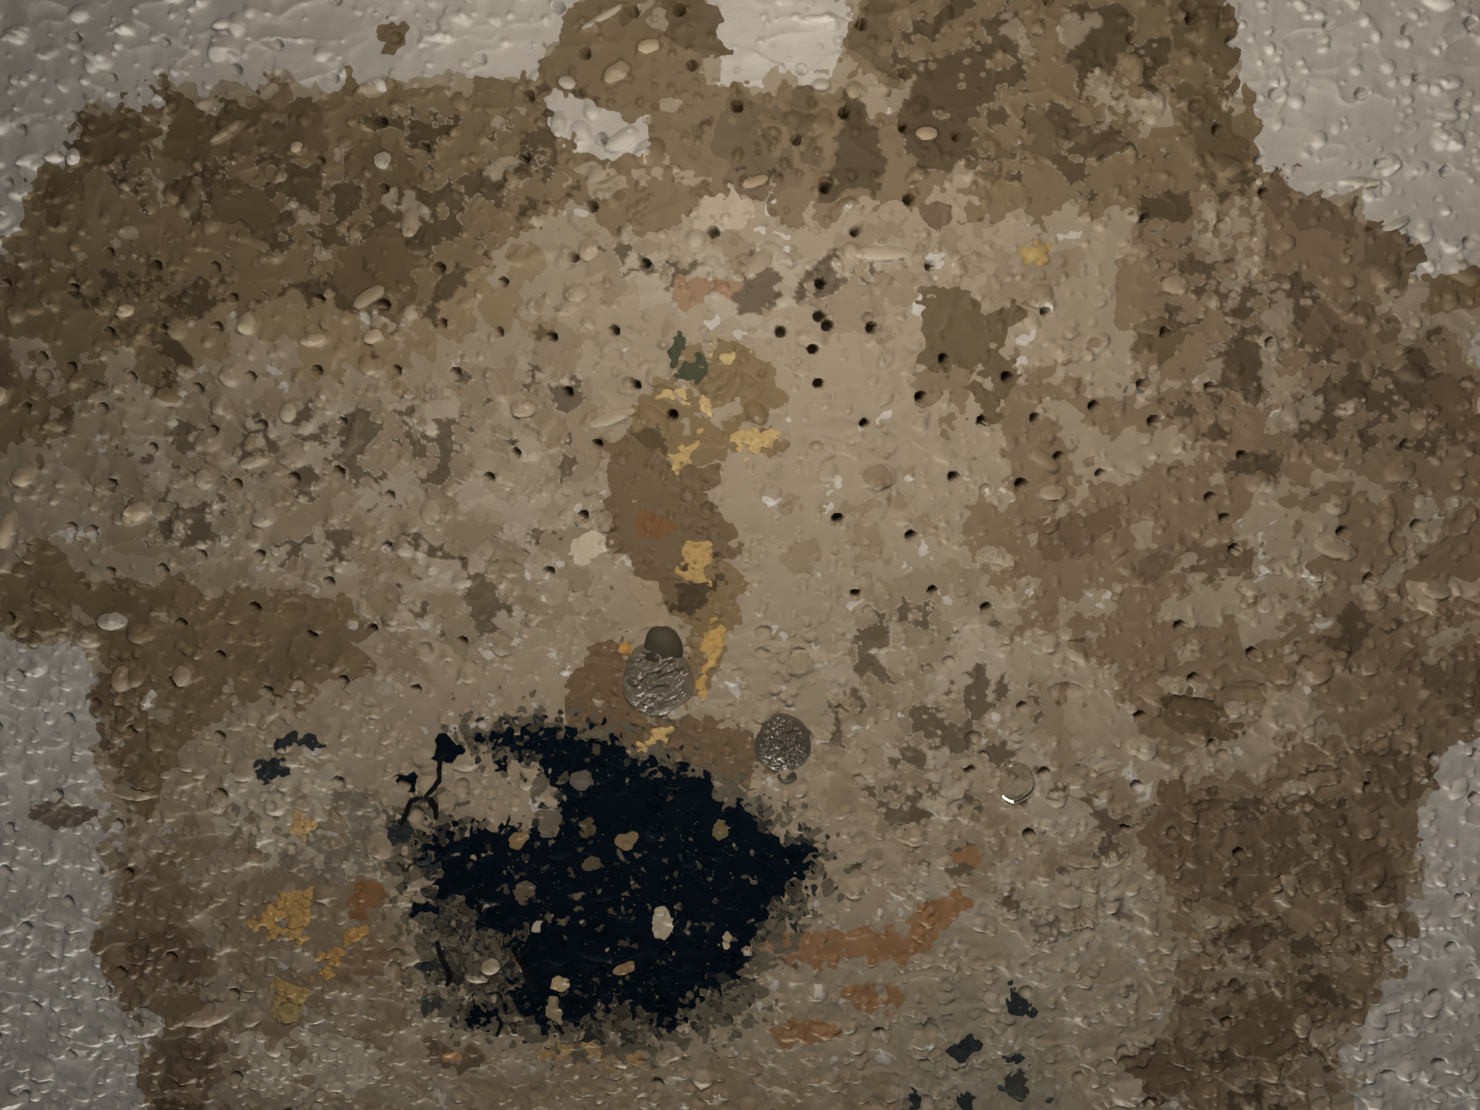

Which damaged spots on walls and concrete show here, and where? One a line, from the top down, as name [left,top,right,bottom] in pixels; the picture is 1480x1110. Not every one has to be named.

damp [376,16,410,55]
damp [27,797,98,831]
damp [957,1091,977,1110]